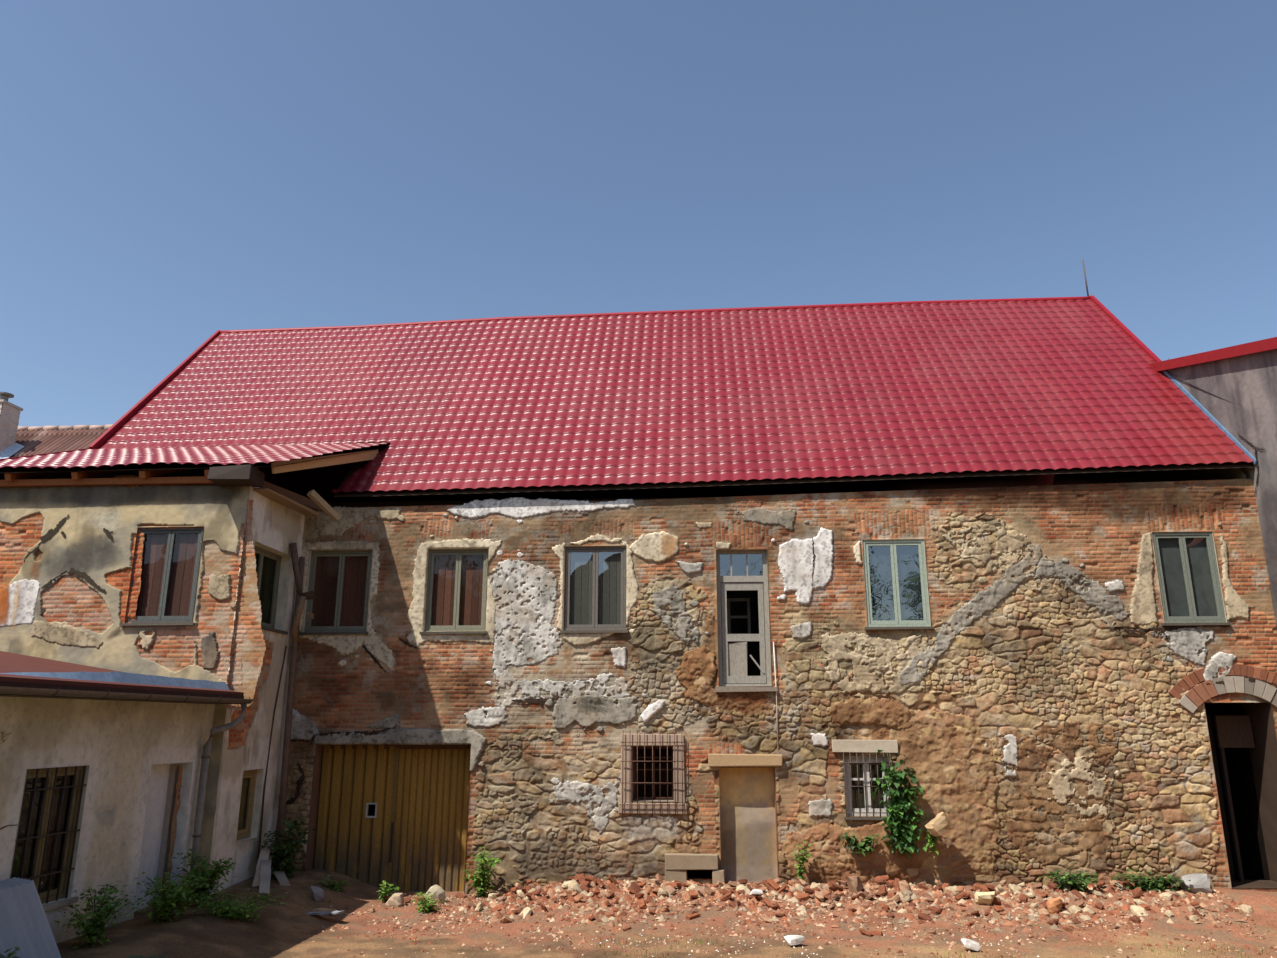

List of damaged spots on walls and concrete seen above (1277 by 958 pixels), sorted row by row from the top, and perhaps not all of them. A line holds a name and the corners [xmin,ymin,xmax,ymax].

spalling [0,500,274,751]
peeling [299,506,405,671]
peeling [291,531,710,772]
peeling [443,497,636,524]
peeling [737,508,834,605]
peeling [853,541,862,564]
peeling [789,621,934,696]
peeling [1105,532,1236,682]
peeling [1218,523,1249,621]
peeling [811,733,829,747]
peeling [549,775,621,833]
peeling [989,721,1123,873]